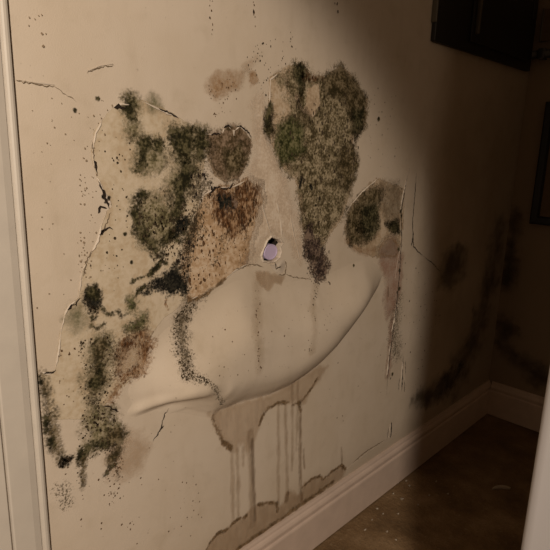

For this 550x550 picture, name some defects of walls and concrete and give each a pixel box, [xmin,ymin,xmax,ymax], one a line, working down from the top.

crack [16,80,73,98]
leakage [37,91,261,504]
peeling [42,64,353,420]
leakage [247,39,406,377]
crack [386,168,440,392]
leakage [237,464,346,550]